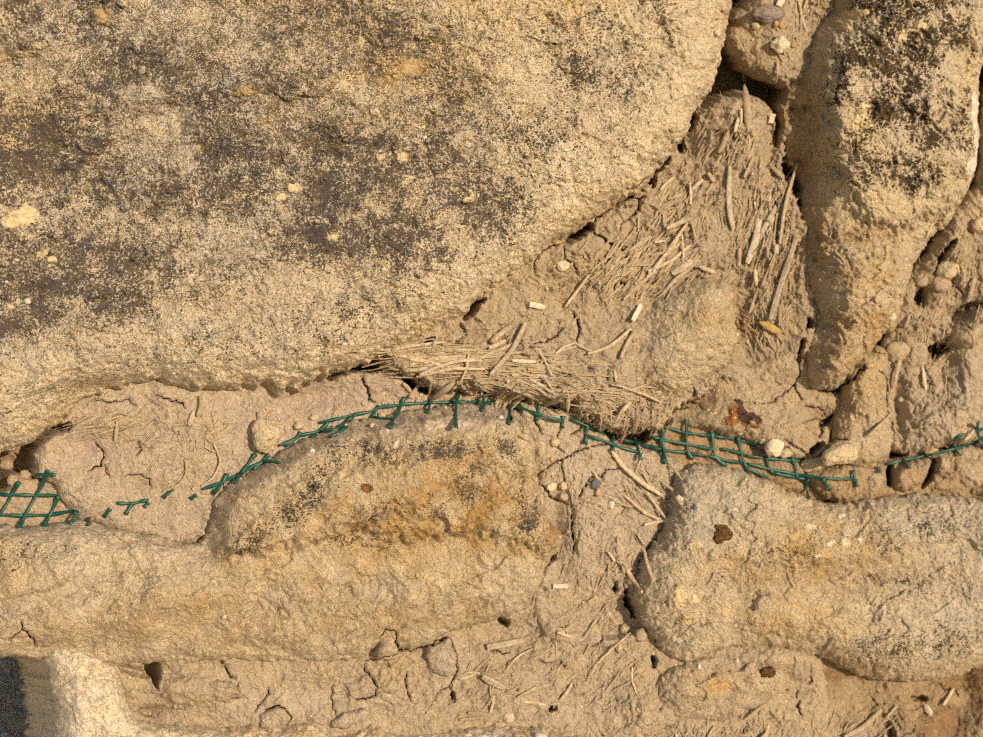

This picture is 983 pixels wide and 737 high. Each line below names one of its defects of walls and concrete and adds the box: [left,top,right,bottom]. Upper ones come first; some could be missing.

crack [533,243,579,276]
crack [586,176,662,290]
crack [762,352,887,455]
crack [87,442,151,487]
crack [534,418,619,553]
crack [330,629,459,715]